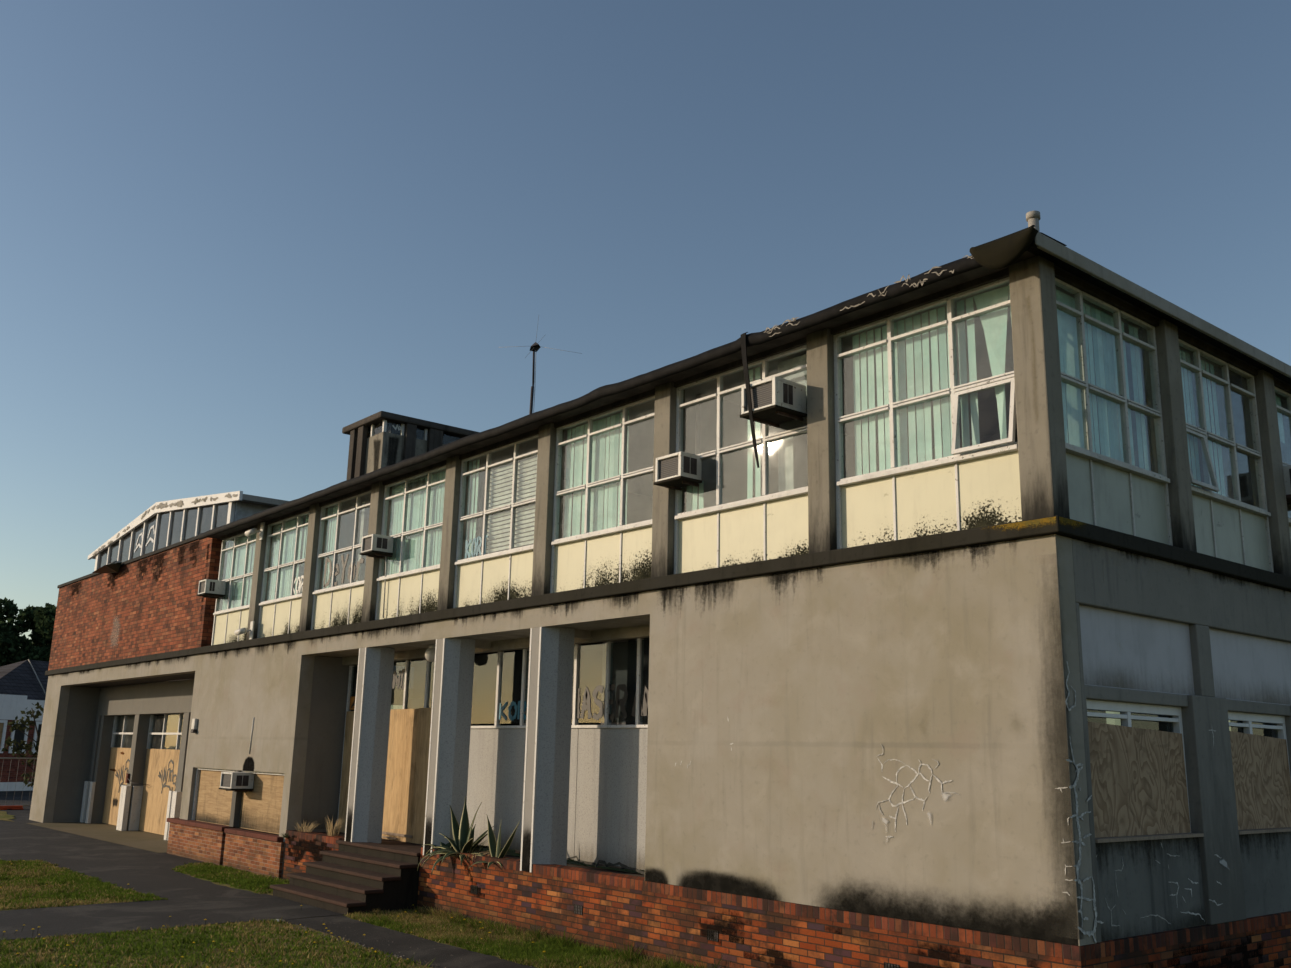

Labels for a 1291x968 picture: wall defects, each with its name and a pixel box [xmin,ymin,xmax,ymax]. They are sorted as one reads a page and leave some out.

leakage [766,567,822,587]
leakage [901,543,994,562]
crack [872,745,956,838]
crack [1055,662,1227,942]
leakage [645,869,780,901]
leakage [824,887,1078,946]